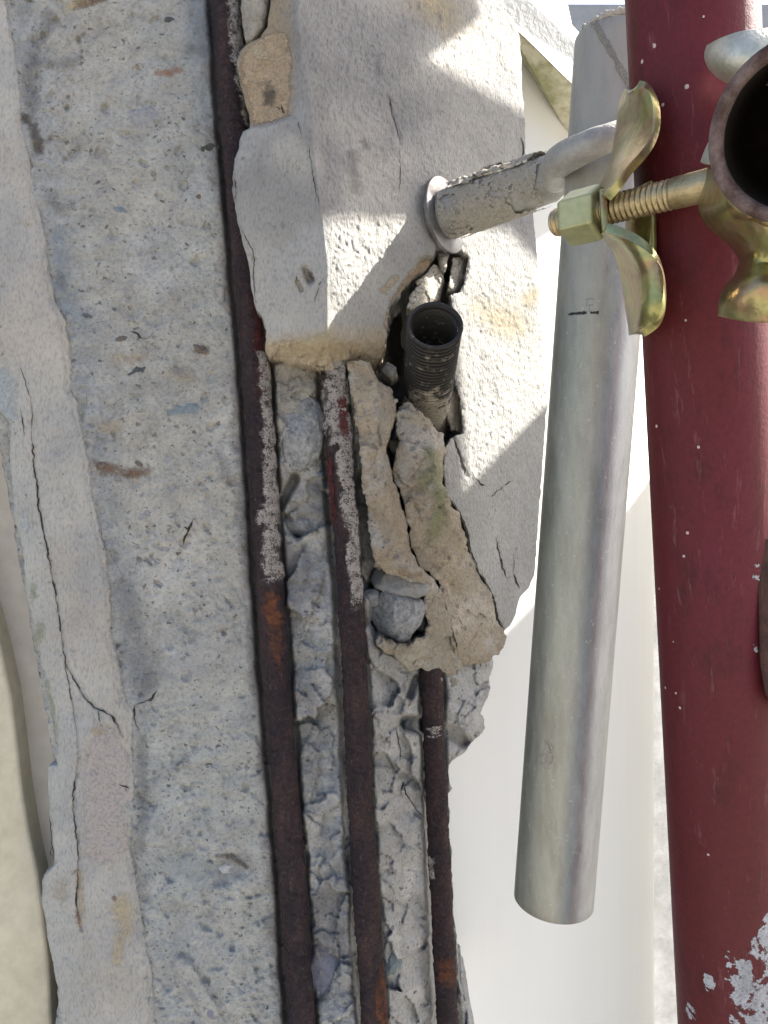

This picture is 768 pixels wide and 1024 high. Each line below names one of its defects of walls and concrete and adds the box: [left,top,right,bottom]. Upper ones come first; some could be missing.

flaking render [227,0,292,127]
rust [253,302,266,354]
flaking render [256,332,379,605]
rust [338,397,349,436]
crack [454,440,510,497]
crack [453,502,520,627]
crack [19,364,157,928]